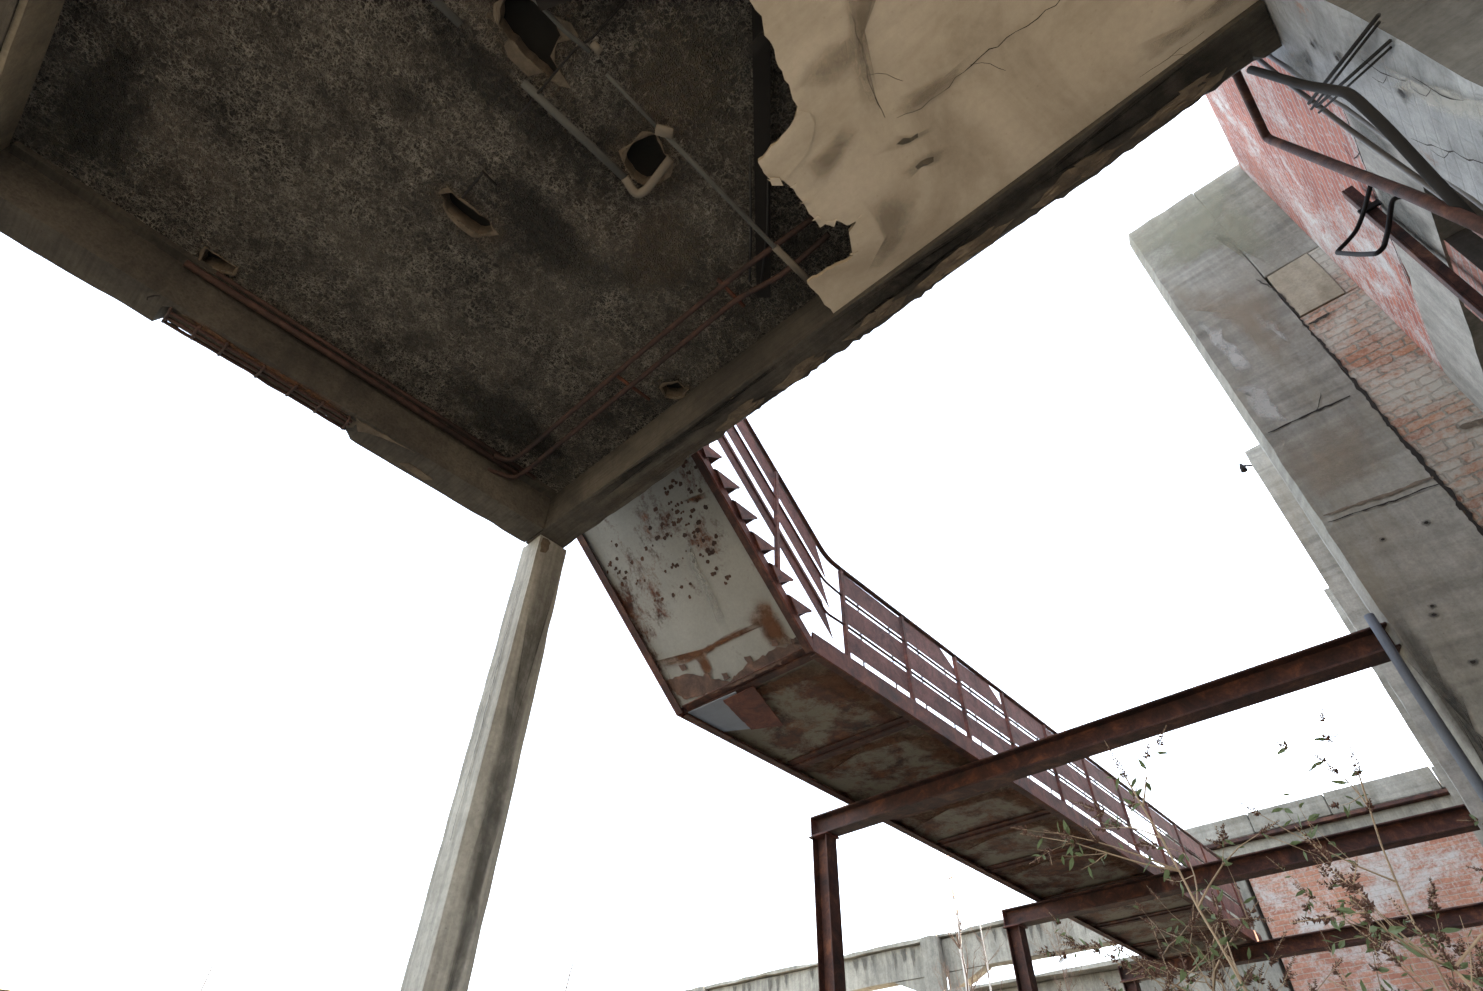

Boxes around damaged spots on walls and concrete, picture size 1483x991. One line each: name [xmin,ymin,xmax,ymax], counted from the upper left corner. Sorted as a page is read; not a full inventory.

spalling [493,0,579,88]
crack [852,0,1060,118]
spalling [438,187,499,238]
spalling [619,131,673,185]
flaking render [758,110,837,227]
flaking render [916,157,934,169]
spalling [1031,67,1227,209]
spalling [841,220,1012,342]
rust [606,459,731,602]
rust [666,604,802,700]
rust [913,789,1138,873]